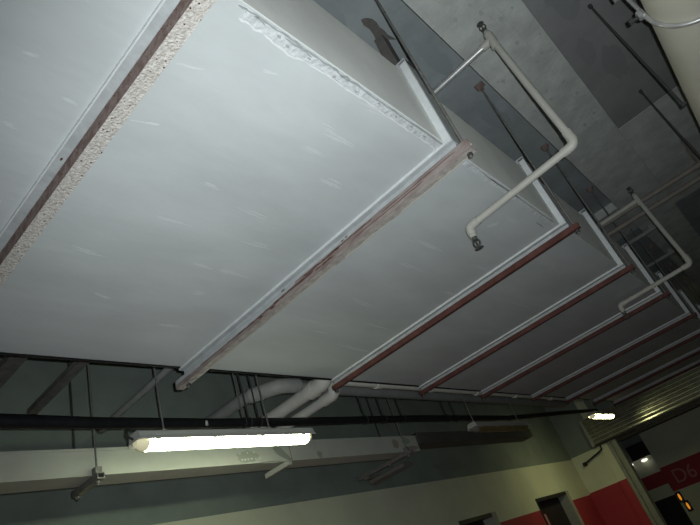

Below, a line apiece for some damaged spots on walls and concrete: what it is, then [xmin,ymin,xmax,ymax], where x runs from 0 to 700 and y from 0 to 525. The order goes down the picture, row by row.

peeling [239,18,436,150]
rust [200,152,454,366]